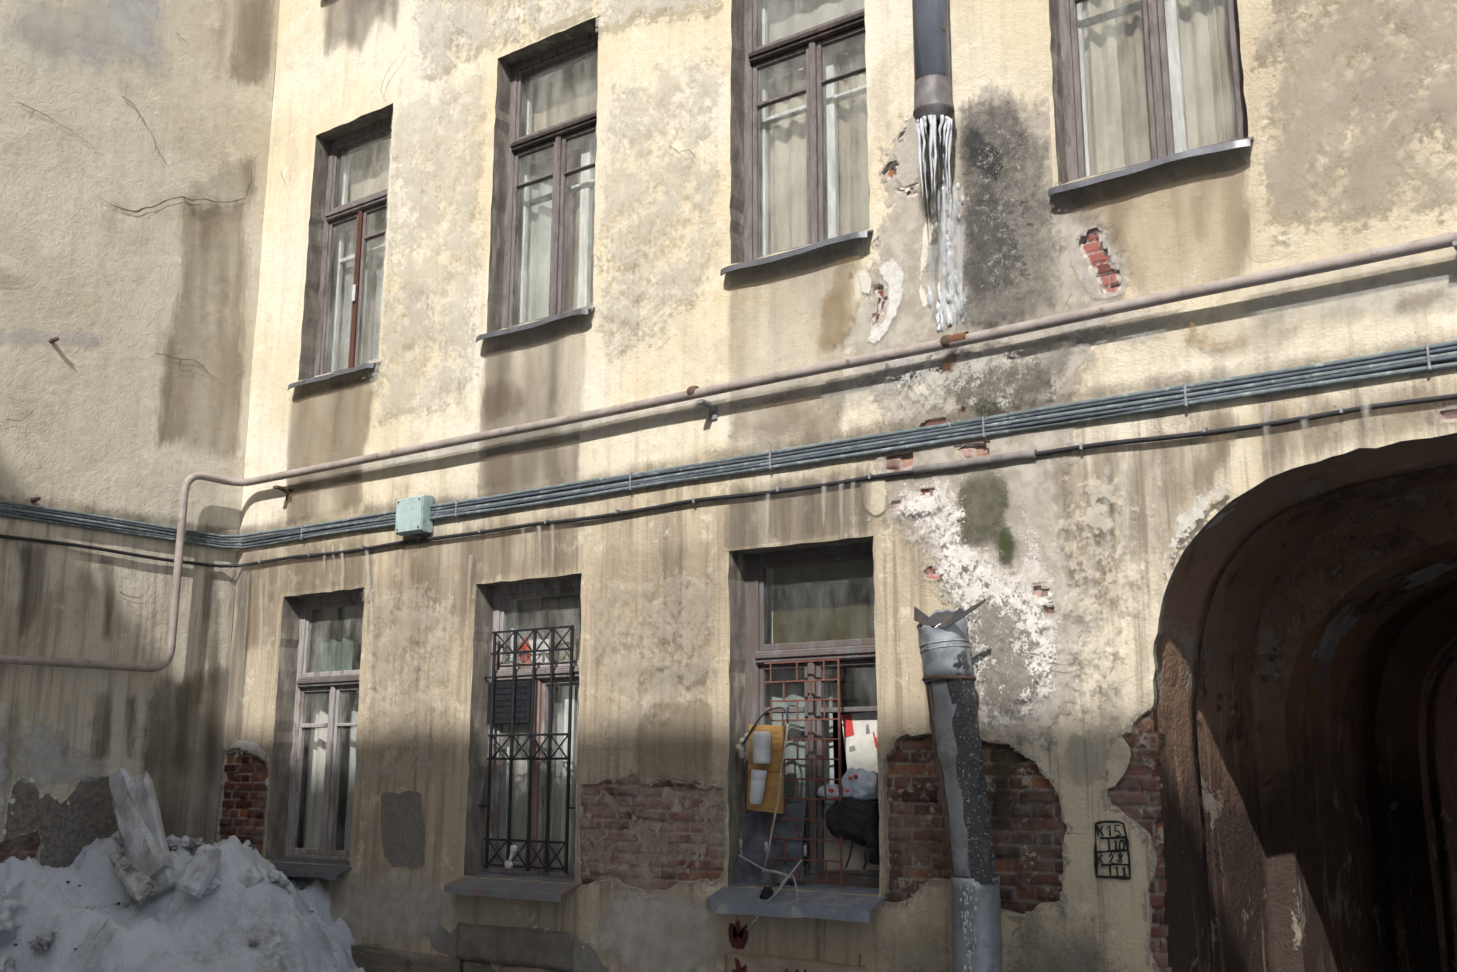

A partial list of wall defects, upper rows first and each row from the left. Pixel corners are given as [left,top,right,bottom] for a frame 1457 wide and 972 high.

crack [16,102,96,150]
crack [99,96,284,213]
leakage [918,93,1049,333]
peeling [834,83,1172,972]
peeling [0,776,118,868]
leakage [161,801,178,838]
spalling [215,740,270,858]
spalling [575,770,727,898]